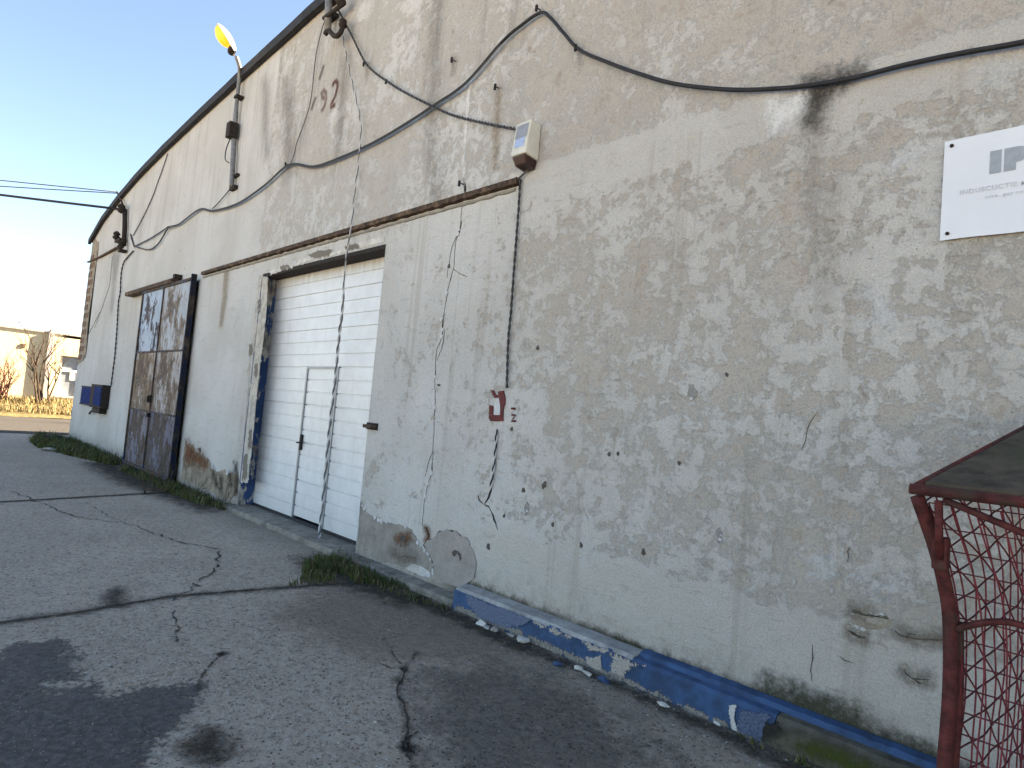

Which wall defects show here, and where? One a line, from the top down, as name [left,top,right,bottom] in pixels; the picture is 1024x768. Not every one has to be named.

damp [804,65,864,124]
peeling [182,235,385,500]
crack [422,184,467,570]
corrosion [184,443,208,468]
crack [11,491,221,642]
flaking render [358,501,433,578]
damp [0,636,209,768]
crack [196,654,225,690]
crack [382,637,418,766]
peeling [466,595,647,680]
peeling [728,705,771,742]